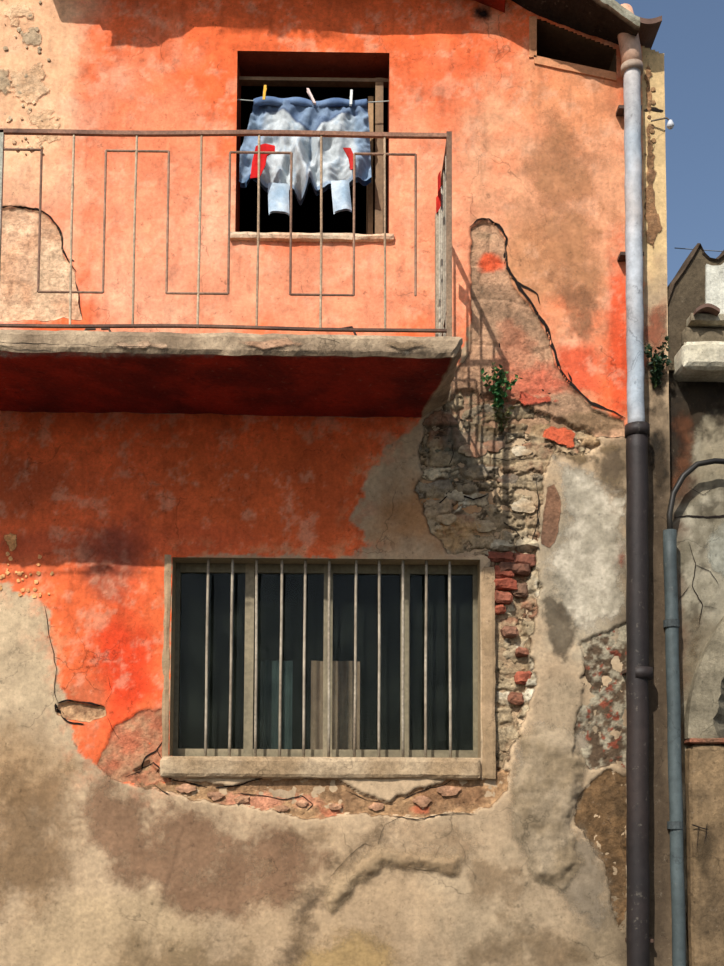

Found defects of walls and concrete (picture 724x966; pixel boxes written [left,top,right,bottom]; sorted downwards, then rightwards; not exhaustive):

peeling [0,0,60,155]
flaking render [0,208,82,322]
crack [470,218,625,418]
crack [675,486,724,518]
peeling [0,533,54,598]
crack [44,606,59,704]
flaking render [98,220,627,930]
leakage [544,596,576,661]
crack [678,542,718,628]
leakage [0,769,64,891]
leakage [84,777,392,966]